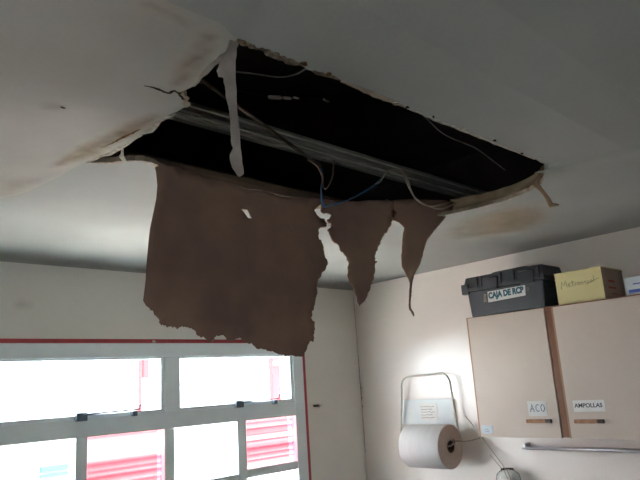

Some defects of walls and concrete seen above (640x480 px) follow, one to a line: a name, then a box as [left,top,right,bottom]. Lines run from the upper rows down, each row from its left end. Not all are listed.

spalling [86,113,176,167]
crack [146,86,184,100]
peeling [193,39,307,177]
spalling [313,70,542,160]